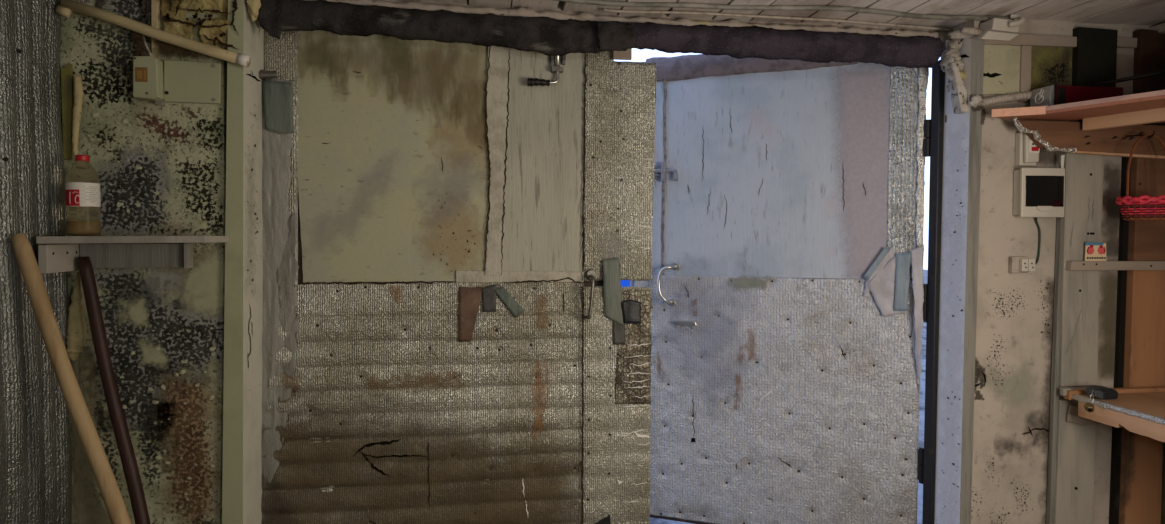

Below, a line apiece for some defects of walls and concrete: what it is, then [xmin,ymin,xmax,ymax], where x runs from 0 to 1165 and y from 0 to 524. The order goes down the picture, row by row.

damp [73,0,151,109]
spalling [132,0,239,60]
damp [92,126,125,163]
damp [151,116,225,251]
damp [93,352,125,492]
damp [99,288,224,524]
damp [1028,283,1054,448]